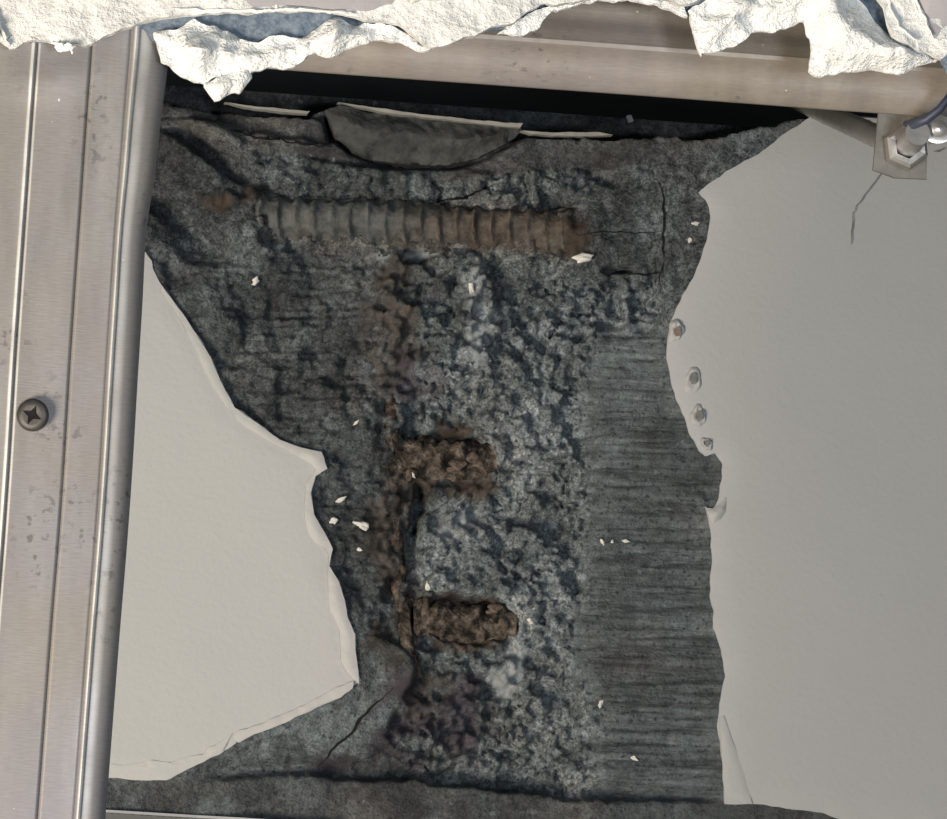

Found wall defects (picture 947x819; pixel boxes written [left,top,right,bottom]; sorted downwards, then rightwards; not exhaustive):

crack [220,127,500,203]
crack [851,174,882,241]
corrosion [446,451,479,472]
spalling [106,85,837,819]
corrosion [411,593,509,652]
crack [316,688,393,770]